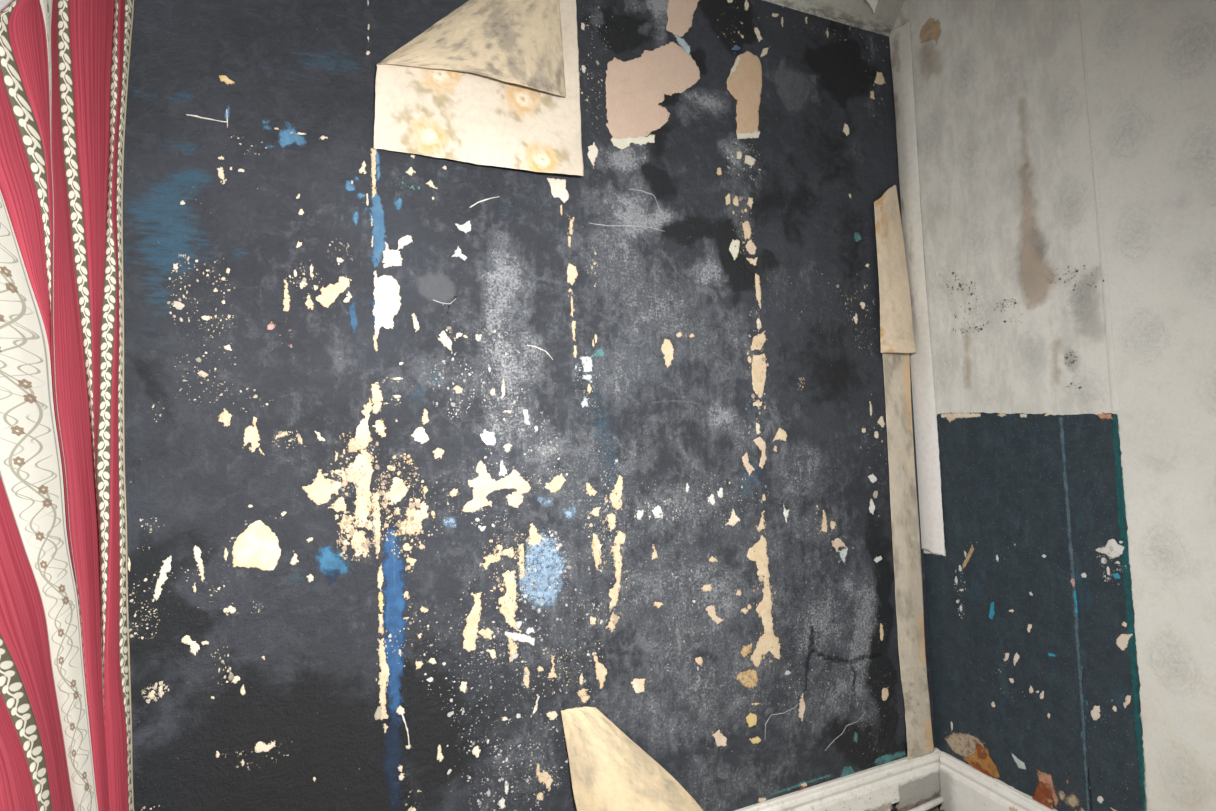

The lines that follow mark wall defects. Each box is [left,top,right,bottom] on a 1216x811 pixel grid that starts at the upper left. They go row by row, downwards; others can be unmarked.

peeling [579,0,700,149]
peeling [717,0,791,180]
peeling [587,142,598,169]
peeling [547,178,575,247]
damp [947,194,1105,333]
peeling [941,412,981,423]
peeling [167,193,836,811]
spalling [954,542,974,618]
spalling [1096,539,1126,585]
spalling [1116,622,1133,650]
spalling [992,653,1044,701]
spalling [1079,689,1133,811]